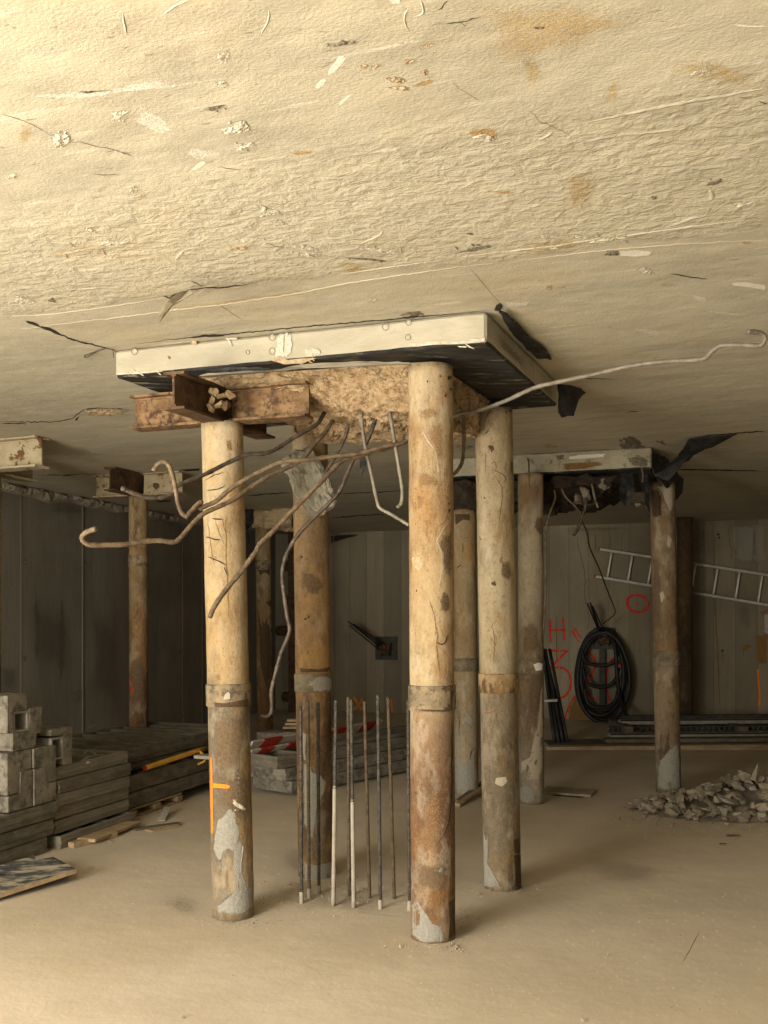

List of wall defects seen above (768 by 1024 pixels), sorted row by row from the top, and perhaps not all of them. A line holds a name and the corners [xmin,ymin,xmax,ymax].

crack [0,113,131,175]
spalling [203,105,256,152]
crack [26,321,117,357]
crack [0,408,133,424]